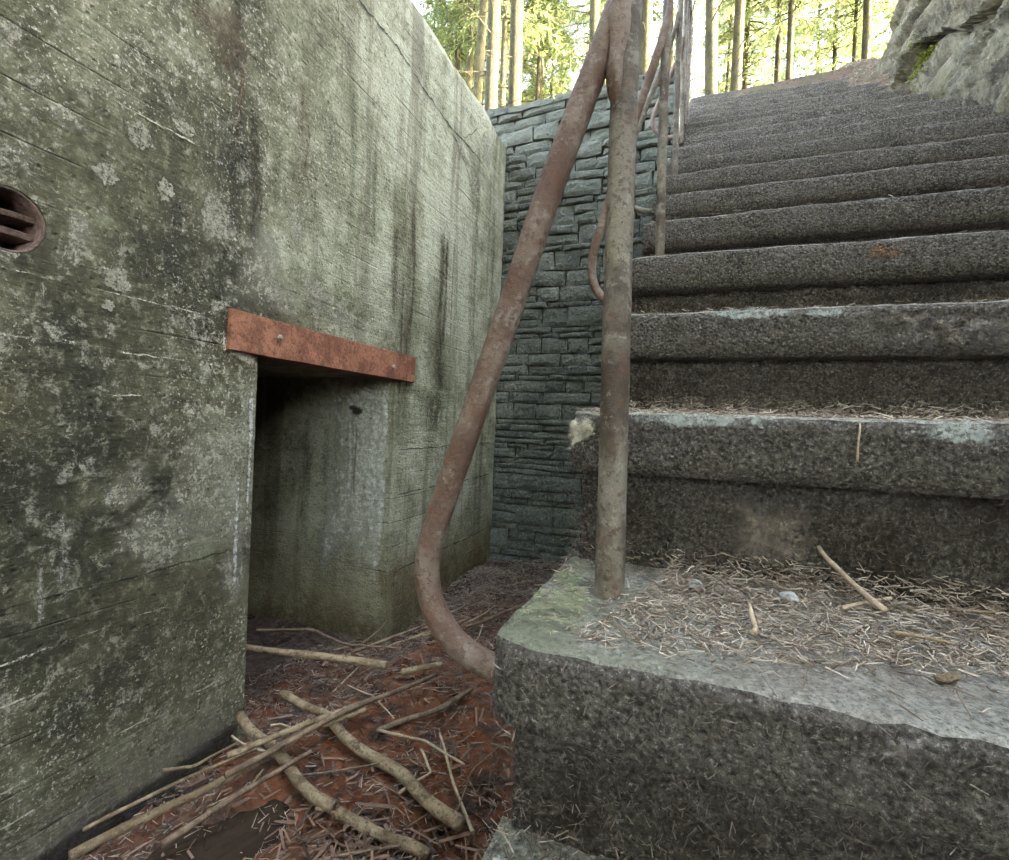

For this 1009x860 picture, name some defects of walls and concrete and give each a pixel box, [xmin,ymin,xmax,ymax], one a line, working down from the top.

crack [337,0,482,192]
leakage [250,114,262,250]
leakage [393,206,415,342]
leakage [438,234,455,355]